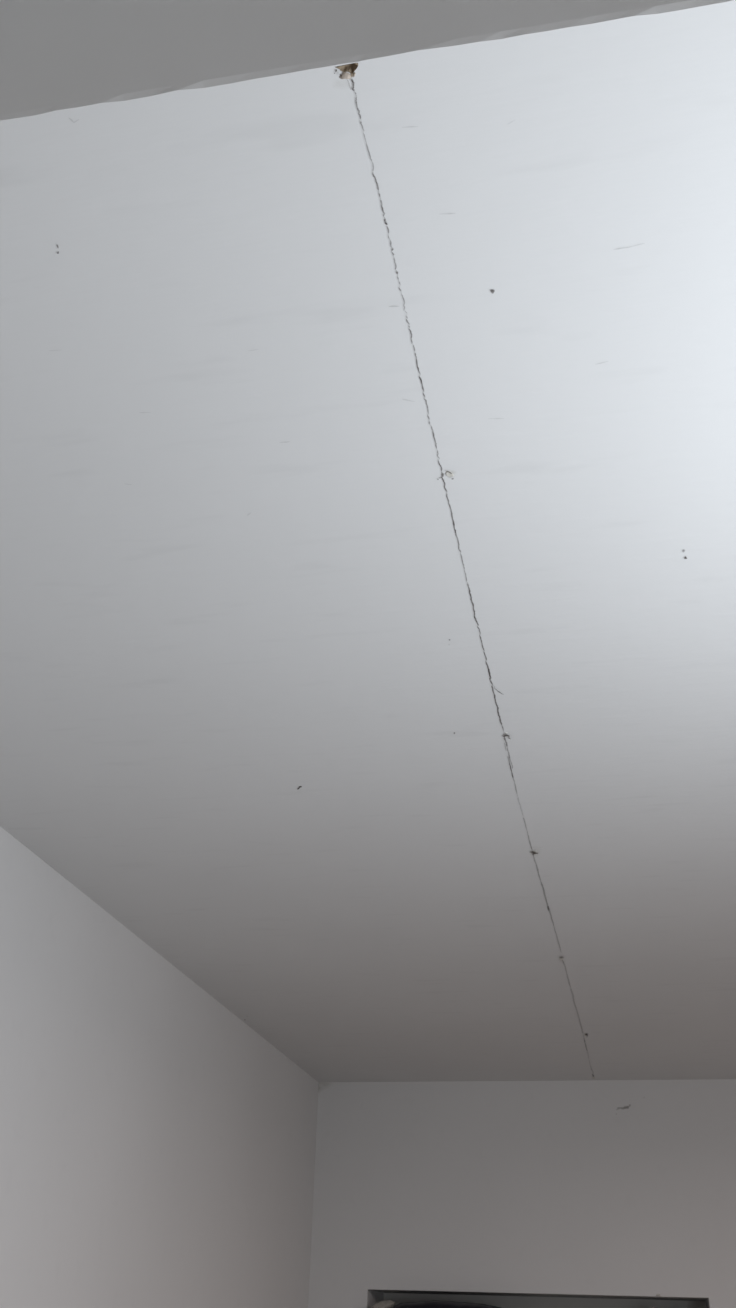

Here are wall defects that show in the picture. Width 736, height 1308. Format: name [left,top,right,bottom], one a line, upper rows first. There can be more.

spalling [334,63,358,79]
crack [351,79,507,745]